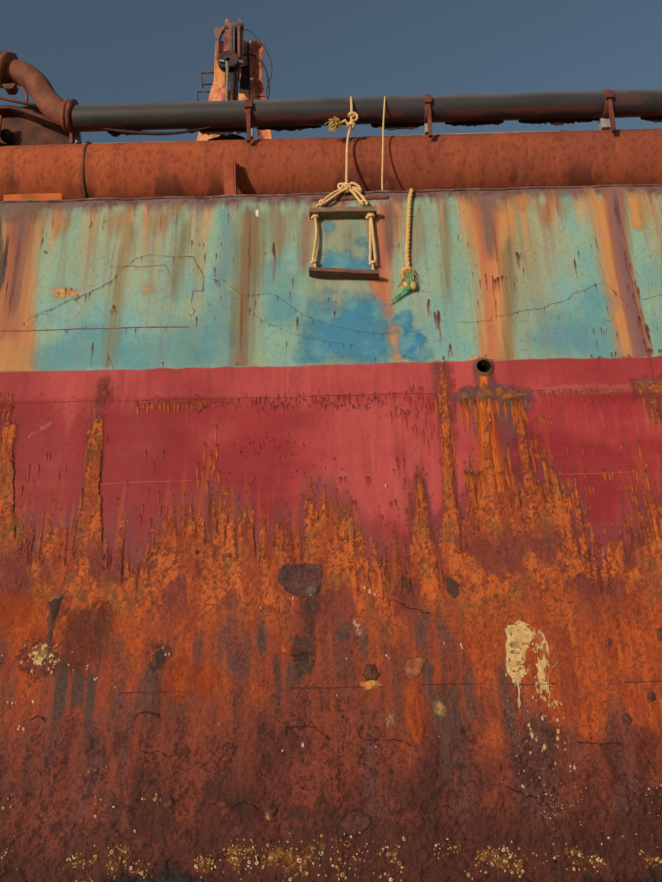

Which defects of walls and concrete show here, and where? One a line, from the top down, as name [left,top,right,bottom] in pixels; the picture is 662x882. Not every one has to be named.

rust [0,203,69,371]
rust [53,288,90,302]
rust [231,208,282,366]
rust [367,203,404,359]
rust [469,194,530,360]
rust [586,186,662,358]
rust [0,344,662,882]
peeling [507,630,566,757]